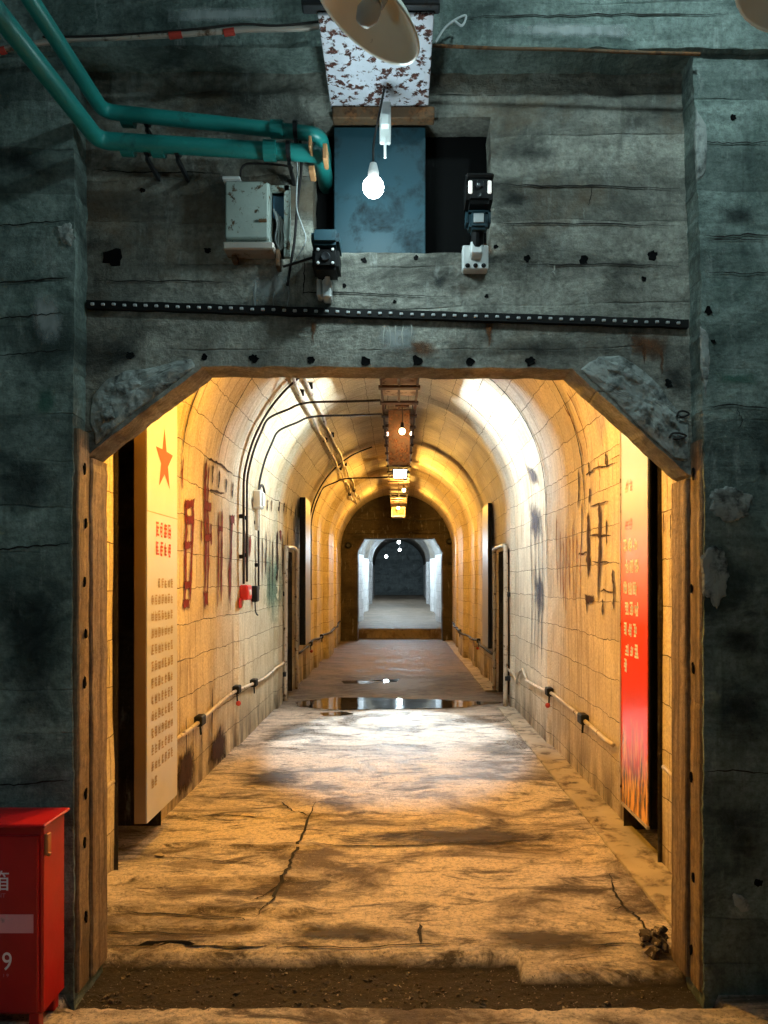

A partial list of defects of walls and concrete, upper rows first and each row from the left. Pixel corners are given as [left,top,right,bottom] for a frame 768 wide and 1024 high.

spalling [709,486,753,523]
damp [530,505,543,654]
spalling [700,546,730,608]
crack [107,799,566,948]
crack [596,874,647,946]